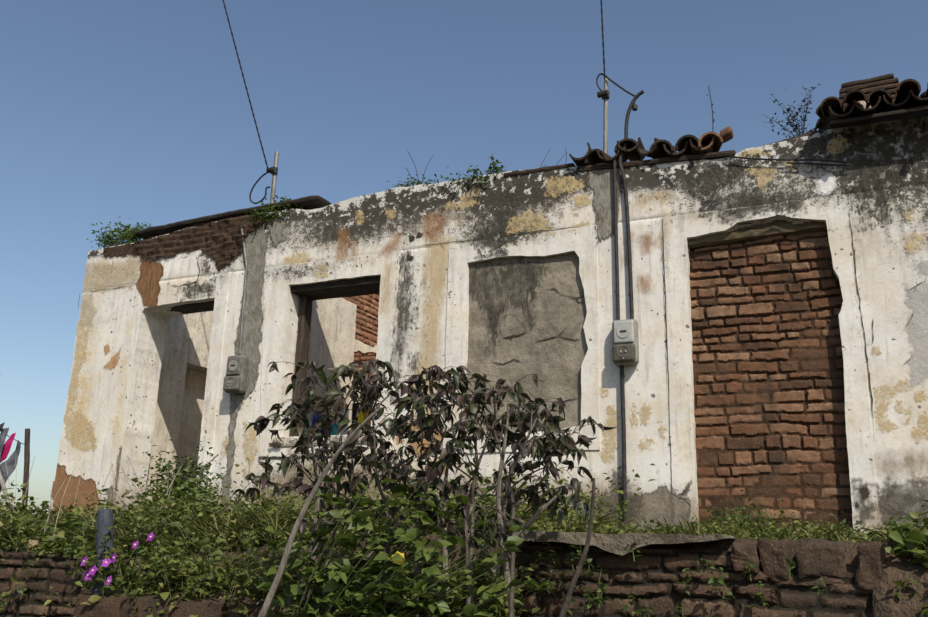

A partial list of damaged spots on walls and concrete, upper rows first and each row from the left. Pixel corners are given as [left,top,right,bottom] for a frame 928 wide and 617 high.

spalling [506,208,589,236]
spalling [544,176,591,210]
leakage [680,155,808,225]
mould [821,118,928,232]
spalling [64,212,286,451]
leakage [383,240,449,415]
crack [848,207,874,425]
peeling [874,209,928,443]
spalling [51,446,122,516]
leakage [852,477,928,529]